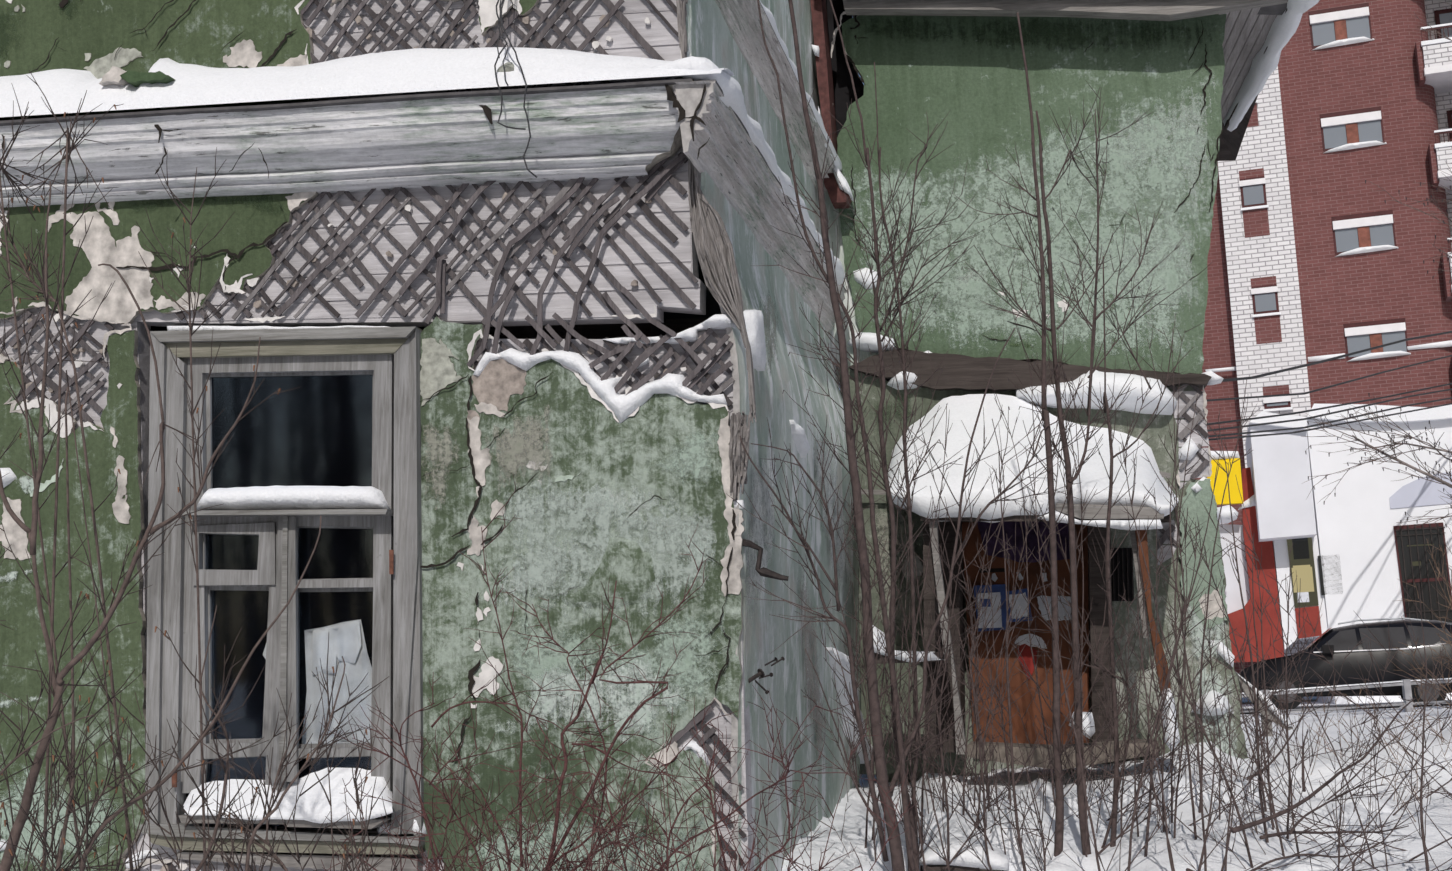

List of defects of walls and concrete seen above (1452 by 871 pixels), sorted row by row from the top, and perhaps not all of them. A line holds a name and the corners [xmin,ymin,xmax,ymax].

crack [28,37,63,74]
crack [114,0,196,60]
crack [260,29,297,67]
spalling [223,0,684,96]
water stain [845,82,1214,357]
spalling [0,149,745,708]
crack [420,374,551,568]
crack [524,559,587,634]
crack [452,592,480,763]